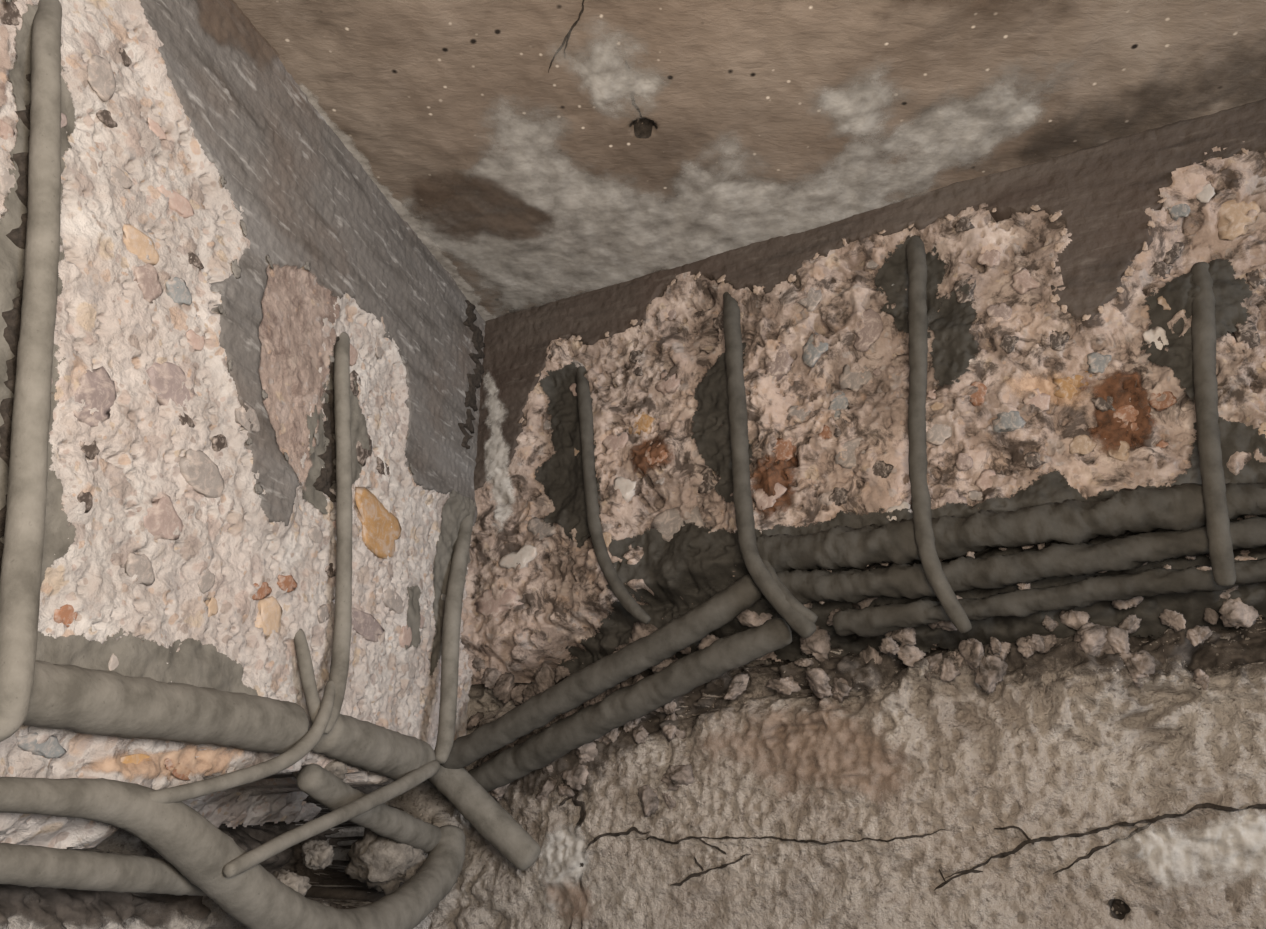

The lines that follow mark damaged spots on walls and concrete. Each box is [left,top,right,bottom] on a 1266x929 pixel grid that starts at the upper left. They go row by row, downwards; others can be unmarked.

crack [548,0,584,73]
water stain [575,37,664,109]
water stain [300,74,1041,321]
spalling [0,0,465,929]
spalling [427,141,1266,870]
rust [1009,371,1155,452]
crack [559,786,946,929]
crack [935,803,1266,890]